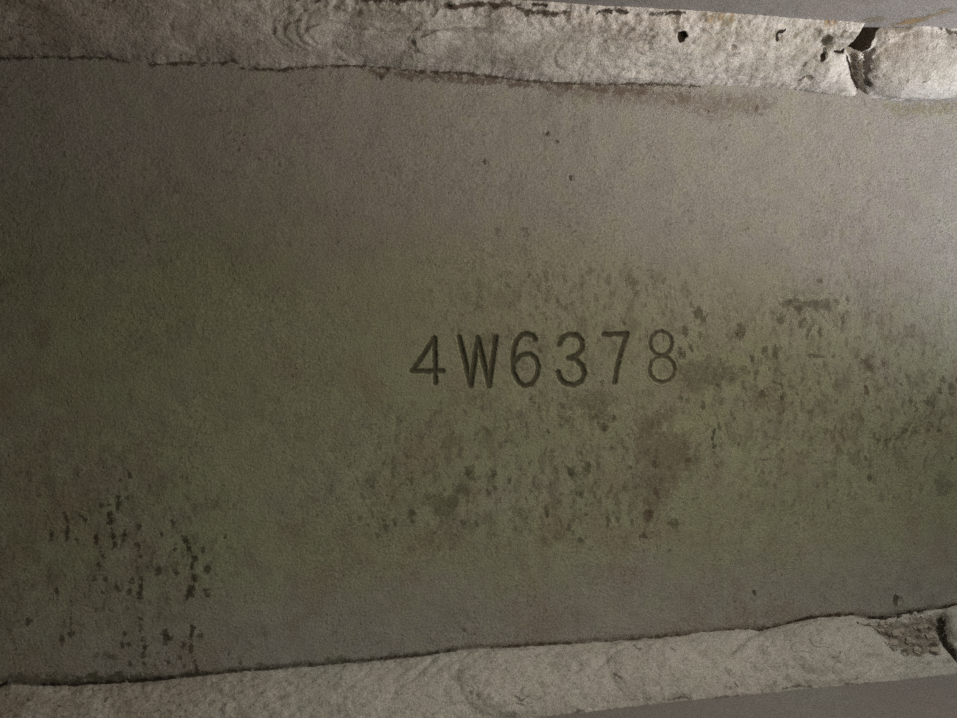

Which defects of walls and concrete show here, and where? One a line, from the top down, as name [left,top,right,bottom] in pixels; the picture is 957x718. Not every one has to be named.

leakage [92,471,144,603]
leakage [173,535,211,600]
leakage [160,622,204,674]
peeling [857,621,941,656]